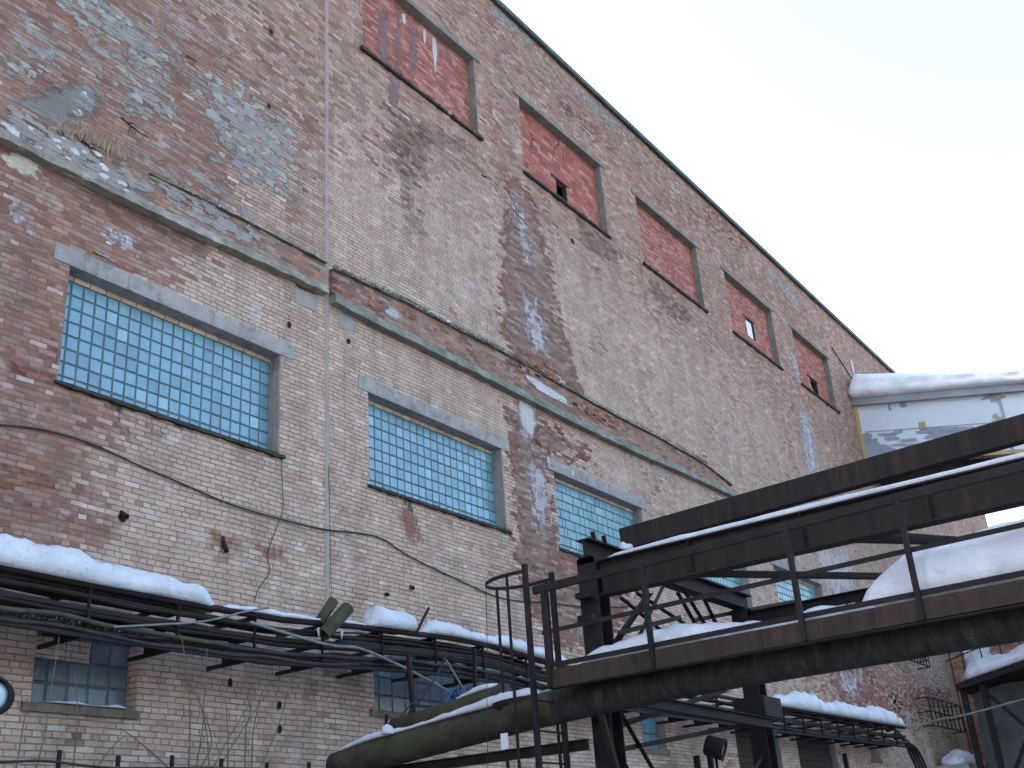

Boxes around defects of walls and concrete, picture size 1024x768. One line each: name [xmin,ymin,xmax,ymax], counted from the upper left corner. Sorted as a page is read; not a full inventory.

peeling [0,0,271,254]
peeling [188,58,305,207]
water stain [377,9,460,208]
water stain [498,175,584,395]
efflorescence [519,400,536,438]
efflorescence [798,408,819,474]
peeling [862,426,974,458]